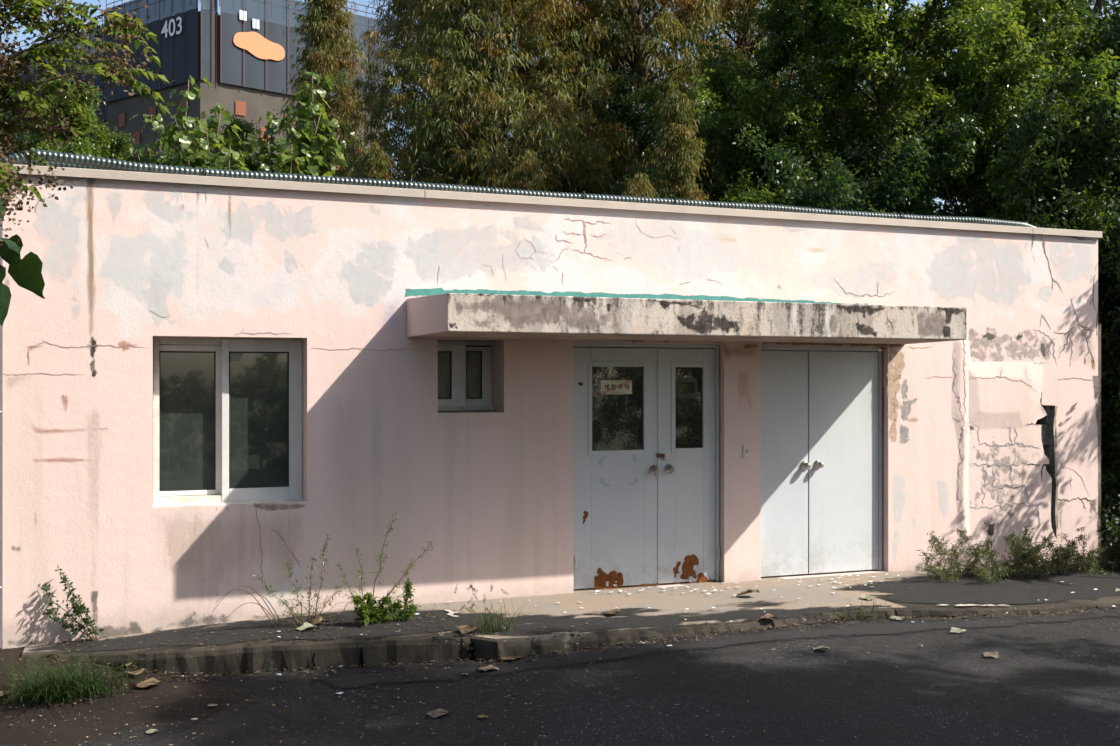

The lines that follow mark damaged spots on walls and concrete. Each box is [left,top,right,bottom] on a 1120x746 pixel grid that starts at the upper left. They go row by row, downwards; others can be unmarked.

crack [482,218,679,284]
crack [3,339,145,375]
mould [447,293,612,331]
leakage [653,299,755,361]
crack [833,278,928,349]
spalling [887,349,917,444]
spalling [968,324,1051,362]
crack [931,233,1099,535]
spalling [1093,376,1101,490]
corrosion [590,568,659,590]
corrosion [673,554,720,584]